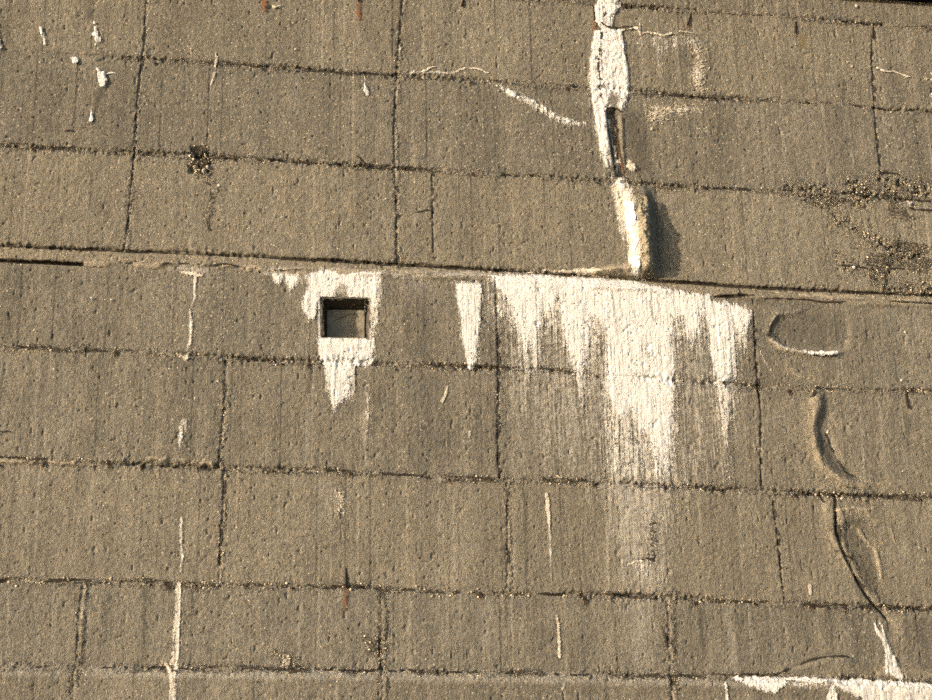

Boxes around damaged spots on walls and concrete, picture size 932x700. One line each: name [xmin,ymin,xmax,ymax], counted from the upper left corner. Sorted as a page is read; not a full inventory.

spalling [65,143,306,179]
efflorescence [405,66,488,76]
spalling [389,0,576,187]
spalling [535,106,747,193]
spalling [628,39,834,130]
spalling [757,175,932,299]
damp [272,269,418,432]
efflorescence [452,176,752,600]
crack [818,495,886,618]
damp [724,609,932,700]